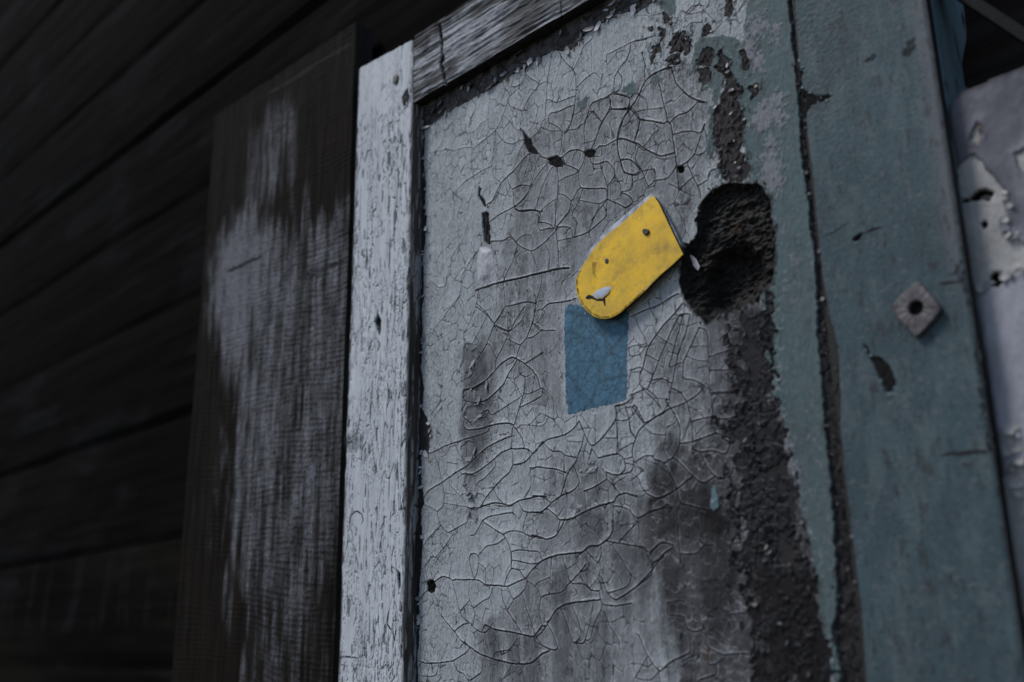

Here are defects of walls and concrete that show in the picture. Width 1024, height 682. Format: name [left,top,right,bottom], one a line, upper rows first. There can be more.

peeling [649,13,761,183]
peeling [957,155,1024,293]
peeling [402,0,658,682]
crack [420,29,778,681]
peeling [712,0,866,682]
peeling [865,348,896,395]
peeling [1002,424,1024,613]
peeling [390,564,403,677]